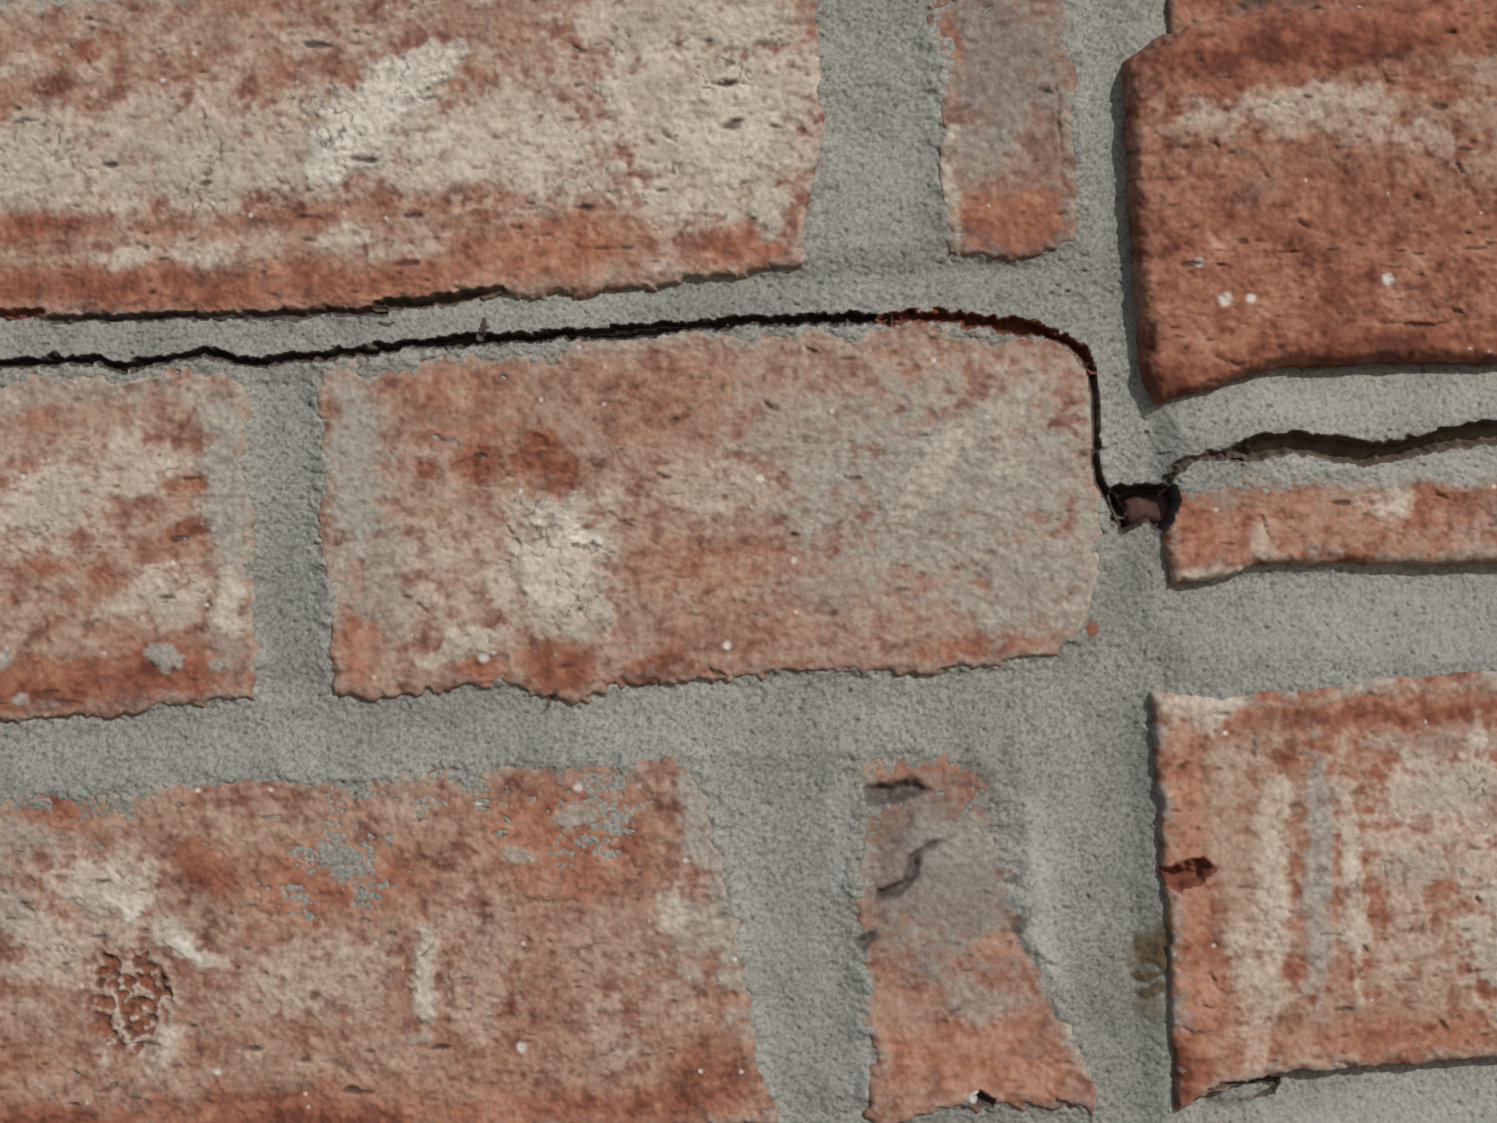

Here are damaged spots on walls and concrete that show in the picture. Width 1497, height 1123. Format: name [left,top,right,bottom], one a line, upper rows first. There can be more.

crack [0,284,1127,519]
crack [1161,419,1497,485]
spalling [62,871,205,1056]
spalling [1159,856,1217,893]